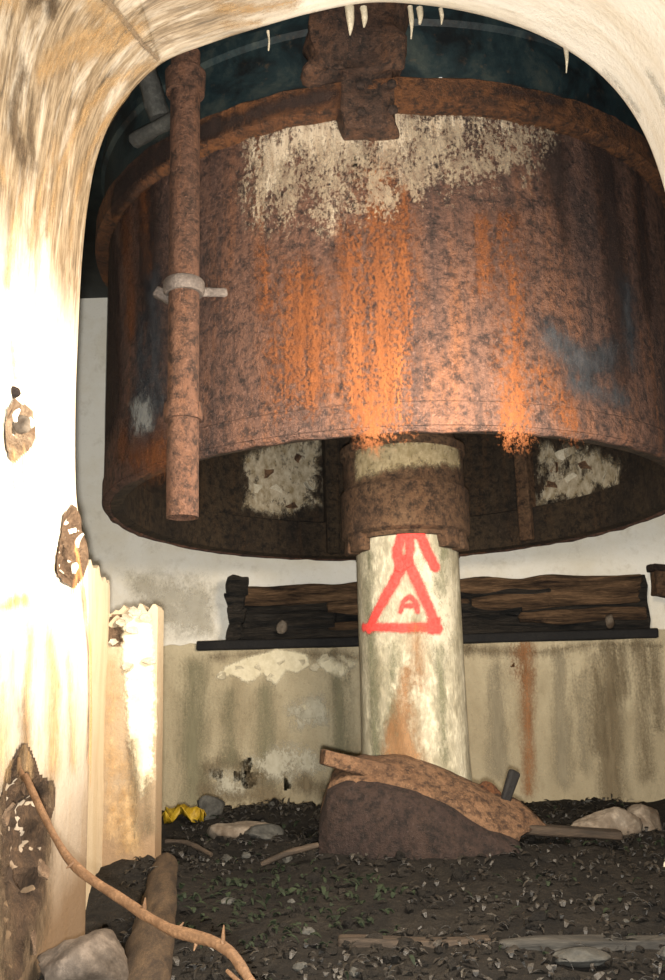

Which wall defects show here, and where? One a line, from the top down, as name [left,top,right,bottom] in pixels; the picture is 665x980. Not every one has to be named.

damp [28,0,59,16]
damp [9,65,150,212]
damp [366,114,512,182]
rust [257,158,417,444]
rust [475,215,579,441]
spalling [4,386,36,463]
spalling [54,504,89,588]
damp [182,660,326,808]
rust [320,626,547,841]
damp [436,646,446,757]
damp [531,638,662,802]
spalling [0,743,56,980]